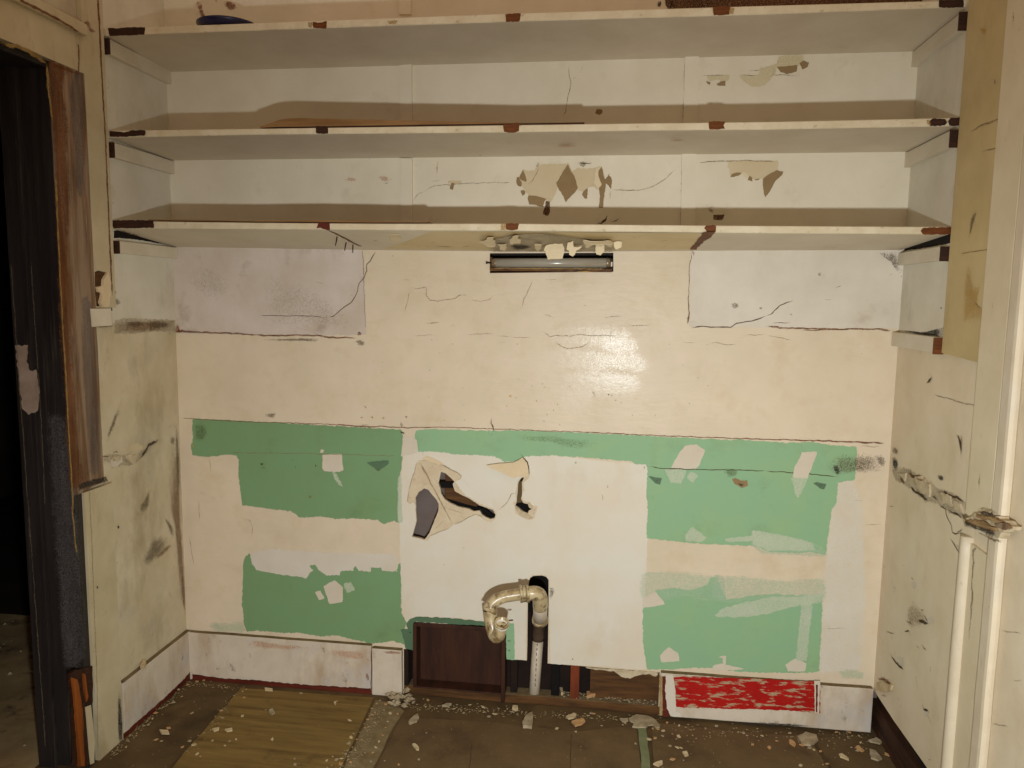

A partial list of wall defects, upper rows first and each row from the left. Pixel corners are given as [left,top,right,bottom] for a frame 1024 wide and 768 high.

peeling [704,55,809,87]
peeling [516,161,612,216]
peeling [700,160,783,197]
peeling [480,234,622,260]
crack [176,231,375,339]
crack [687,255,890,345]
spalling [15,345,40,415]
spalling [407,452,538,541]
water stain [827,448,898,475]
spalling [404,575,660,715]